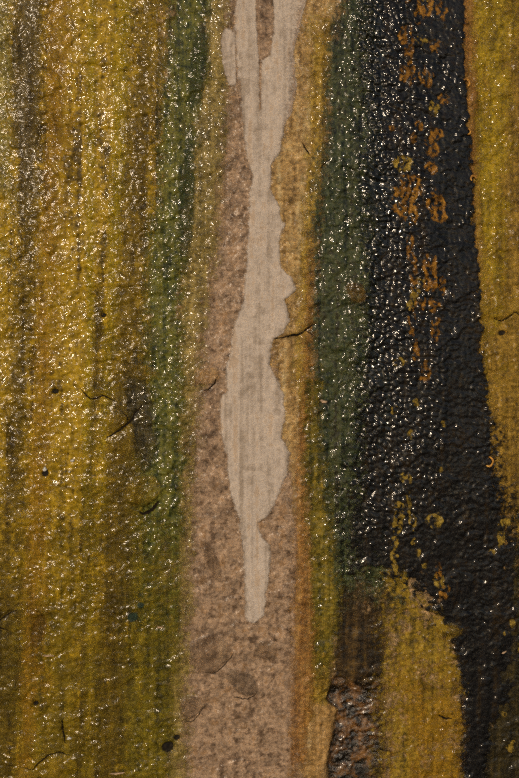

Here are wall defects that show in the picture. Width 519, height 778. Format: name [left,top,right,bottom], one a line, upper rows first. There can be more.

damp [4,0,46,573]
crack [81,389,142,437]
damp [97,20,160,778]
damp [179,0,308,778]
crack [274,323,316,339]
damp [335,0,519,778]